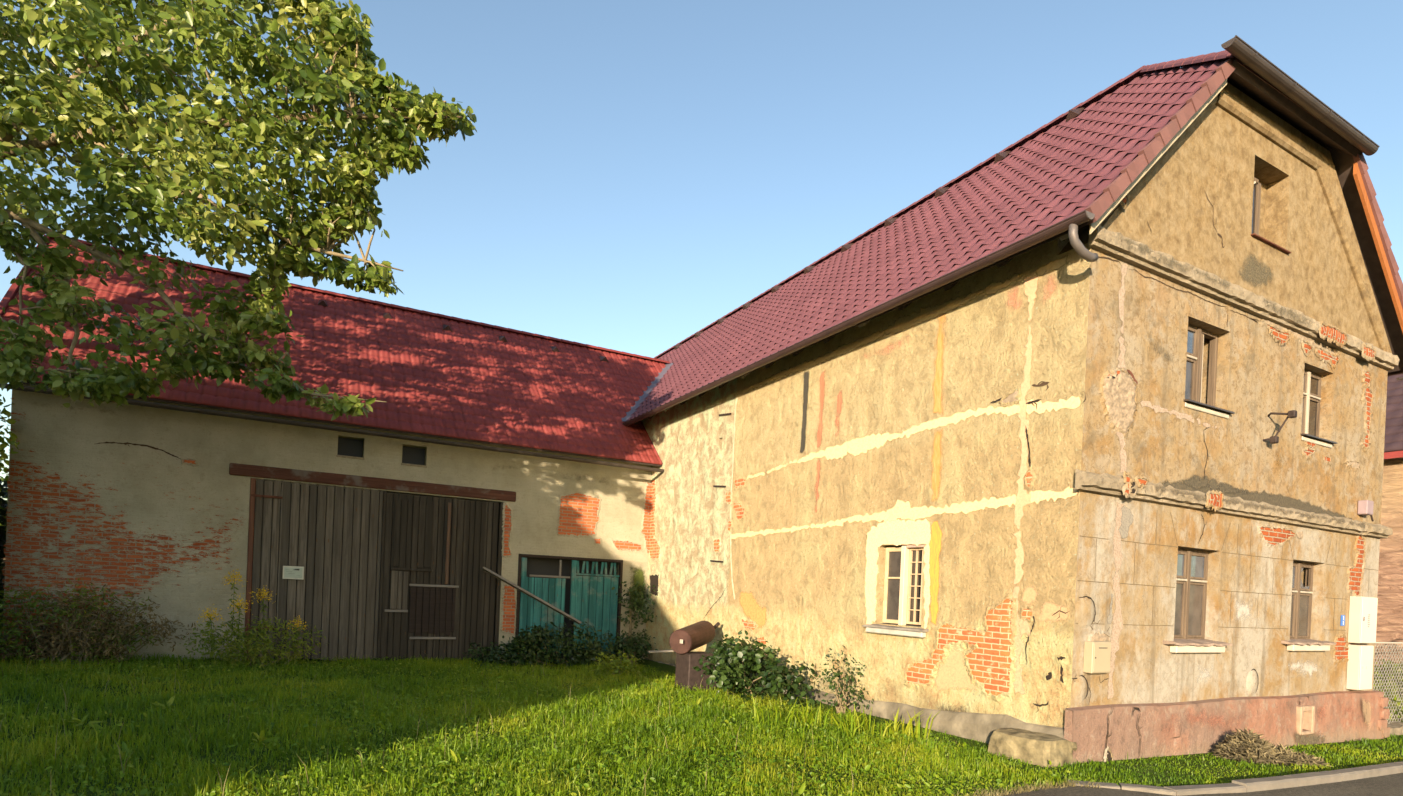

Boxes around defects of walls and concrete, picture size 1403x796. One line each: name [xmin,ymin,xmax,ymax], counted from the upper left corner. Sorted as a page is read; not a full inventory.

spalling [1262,318,1376,472]
spalling [2,398,244,648]
spalling [500,583,517,636]
spalling [556,477,662,583]
spalling [865,519,1068,702]
spalling [1256,524,1303,549]
spalling [1332,633,1349,663]
spalling [1346,535,1366,596]